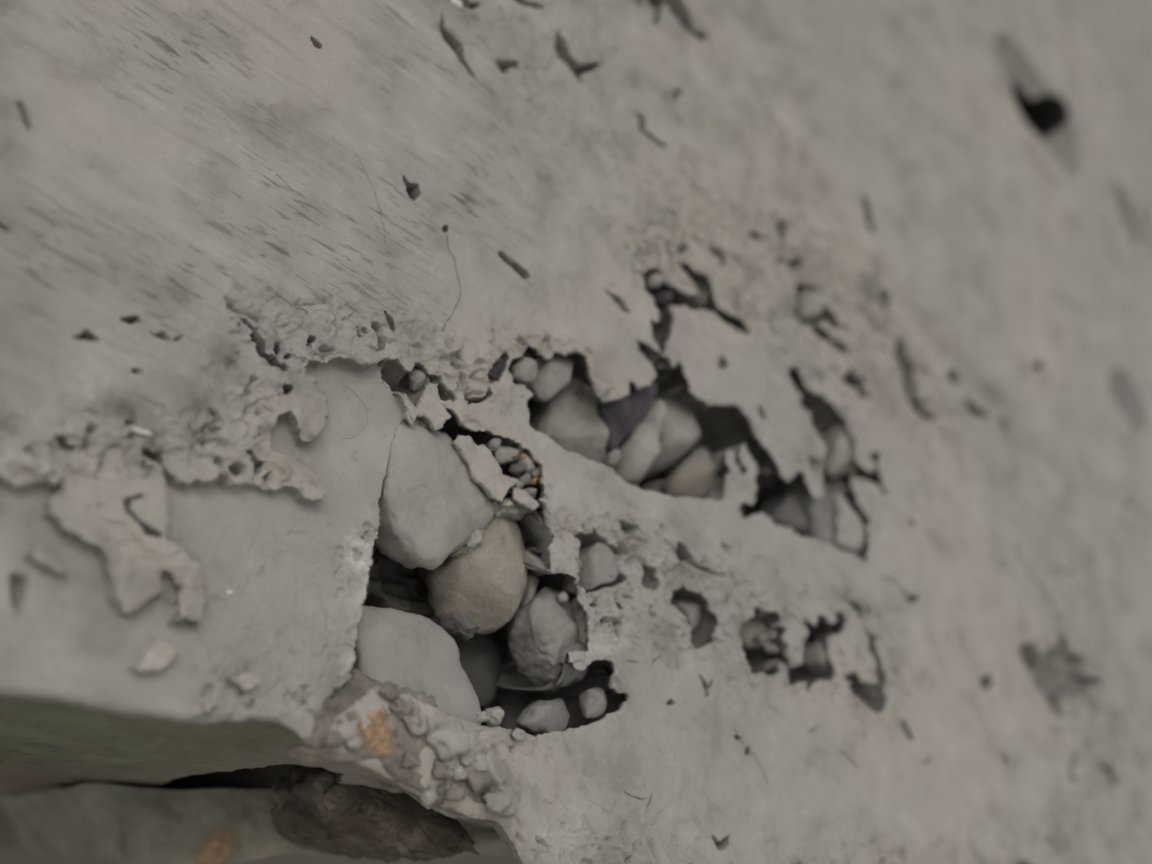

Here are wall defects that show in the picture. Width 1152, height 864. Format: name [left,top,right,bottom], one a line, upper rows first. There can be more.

hole [498,251,532,279]
spalling [602,287,631,313]
peeling [452,435,539,511]
spalling [619,519,639,535]
peeling [525,525,582,584]
spalling [675,541,728,576]
spalling [0,311,518,863]
spalling [699,675,715,696]
spalling [510,728,526,741]